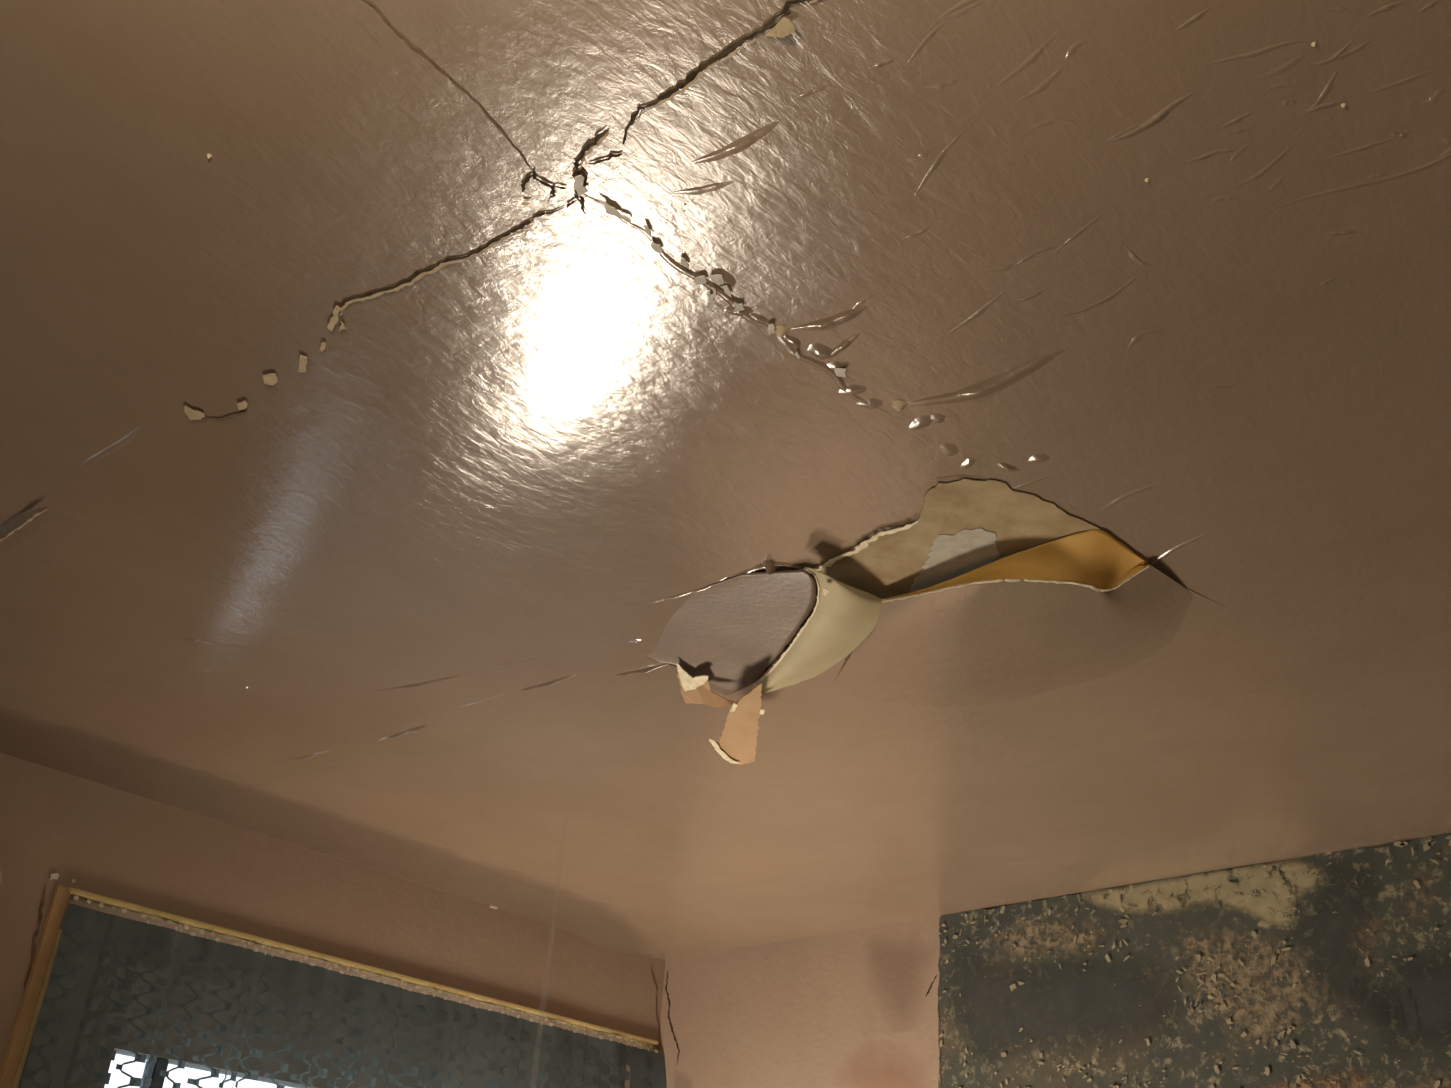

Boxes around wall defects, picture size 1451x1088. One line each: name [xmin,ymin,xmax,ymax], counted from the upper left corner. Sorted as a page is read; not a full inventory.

crack [67,0,816,478]
water stain [937,833,1451,1088]